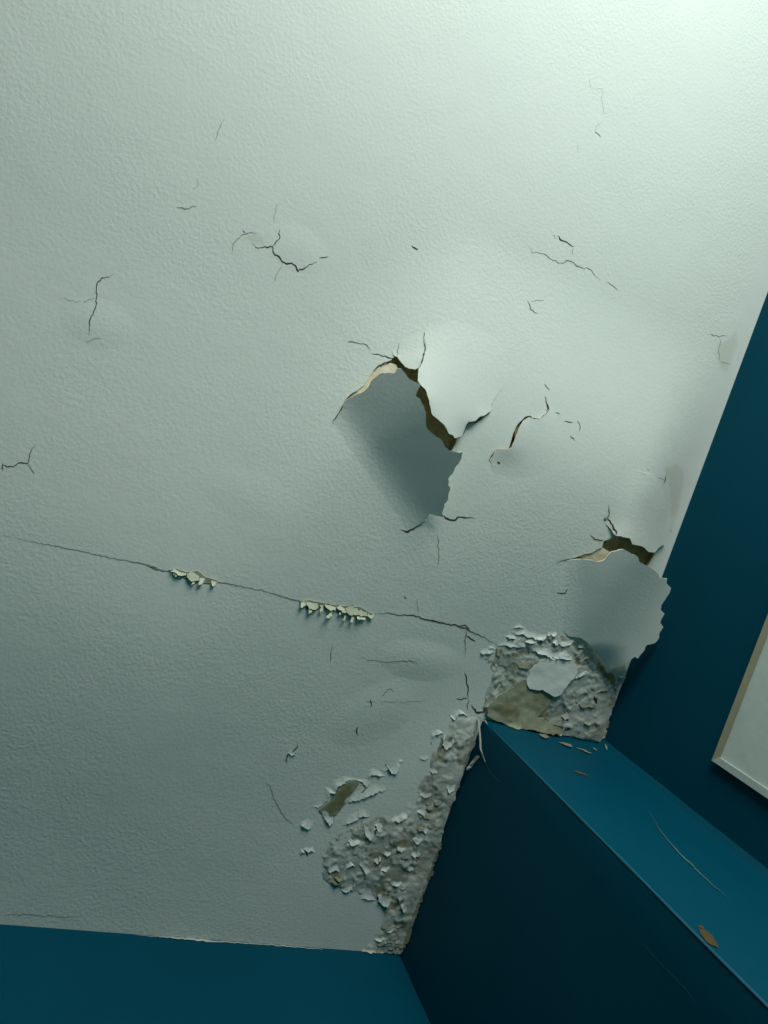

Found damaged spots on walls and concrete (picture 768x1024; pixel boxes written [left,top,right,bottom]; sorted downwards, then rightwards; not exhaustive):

crack [232,204,328,280]
crack [531,235,618,290]
crack [65,277,106,342]
crack [489,384,581,478]
crack [8,537,170,572]
peeling [151,566,217,586]
crack [217,582,300,601]
peeling [300,600,374,623]
spalling [299,624,627,954]